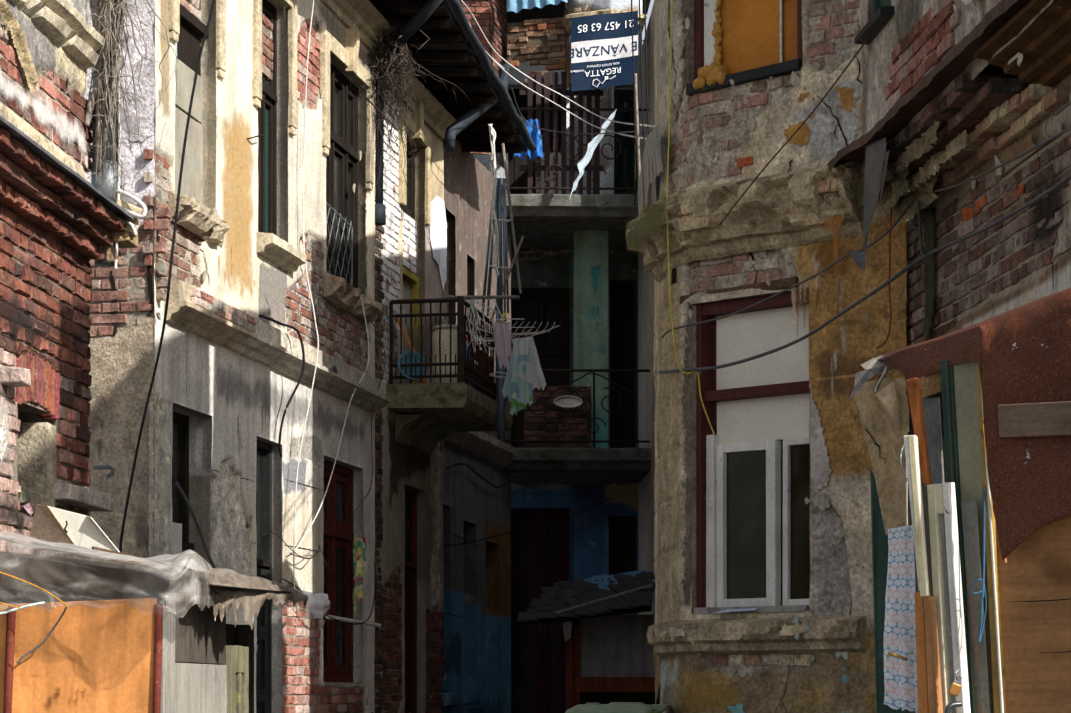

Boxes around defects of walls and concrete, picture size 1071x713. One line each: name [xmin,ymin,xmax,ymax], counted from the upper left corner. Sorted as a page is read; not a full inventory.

spalling [298,18,323,110]
spalling [667,0,814,232]
crack [816,95,848,146]
spalling [806,0,860,73]
peeling [831,86,862,131]
spalling [881,0,971,110]
spalling [89,149,256,337]
spalling [284,86,405,384]
spalling [906,93,1071,347]
spalling [282,410,404,713]
peeling [724,704,745,713]